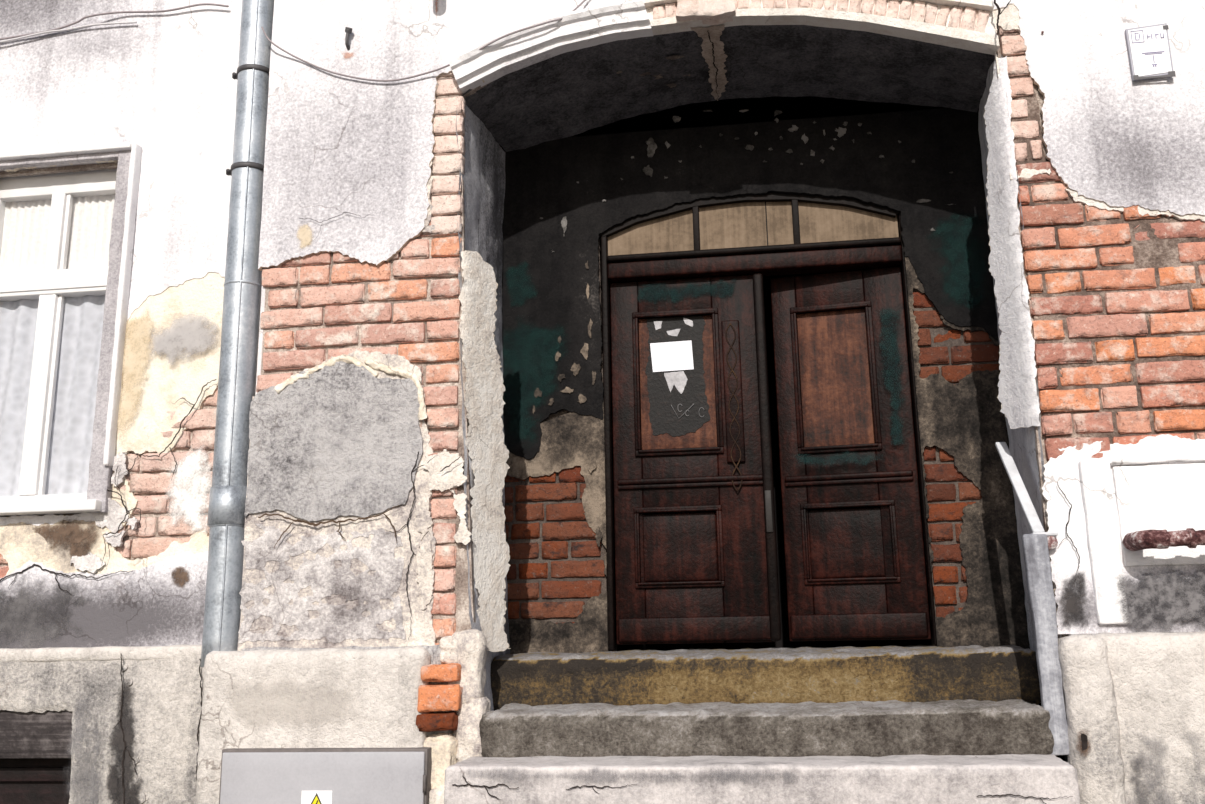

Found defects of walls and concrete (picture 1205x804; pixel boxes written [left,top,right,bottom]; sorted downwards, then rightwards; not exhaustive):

crack [707,31,719,100]
peeling [719,110,871,165]
peeling [992,3,1205,461]
leakage [0,584,84,648]
leakage [34,520,97,565]
peeling [0,272,225,578]
peeling [237,72,472,651]
crack [258,452,462,640]
peeling [504,318,609,654]
peeling [904,256,1030,649]
leakage [1119,567,1205,631]
crack [112,654,148,804]